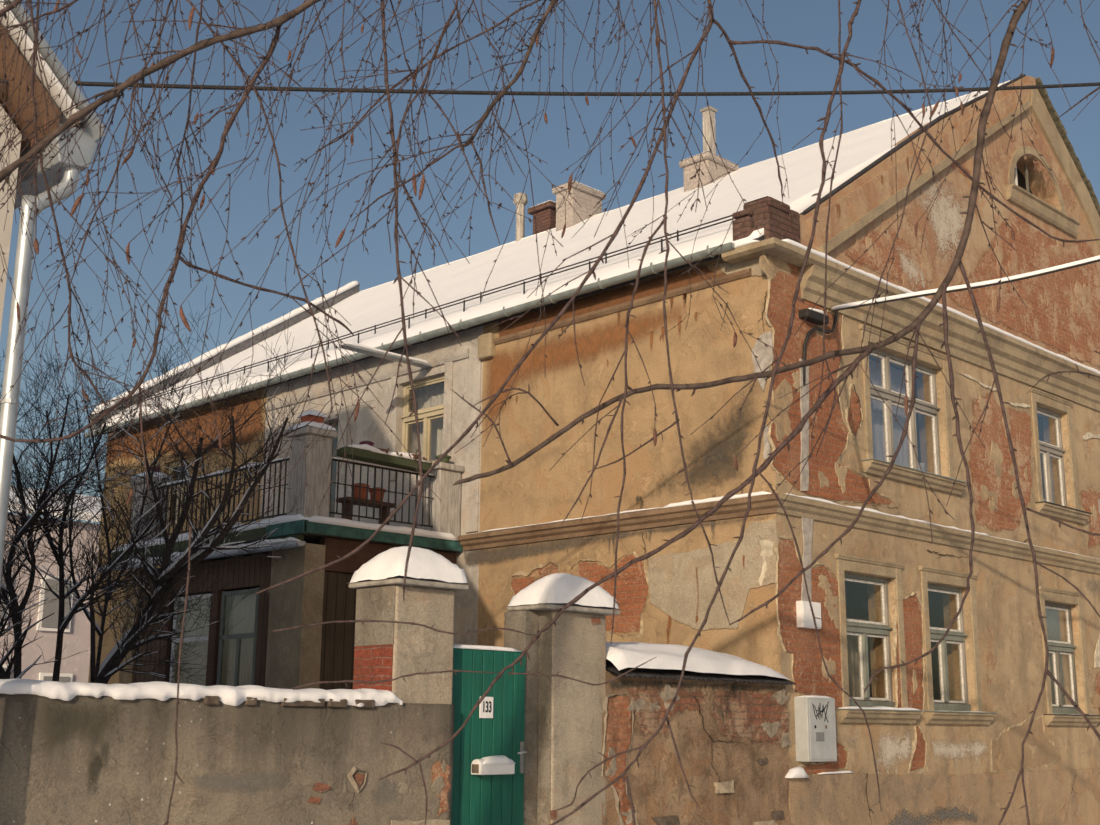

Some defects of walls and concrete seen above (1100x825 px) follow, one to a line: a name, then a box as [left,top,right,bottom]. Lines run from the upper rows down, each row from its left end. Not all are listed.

water stain [688,397,749,484]
spalling [756,253,898,508]
spalling [957,372,1033,533]
spalling [509,551,650,638]
spalling [601,536,849,825]
spalling [893,592,927,774]
spalling [1090,634,1100,712]
spalling [430,760,452,816]